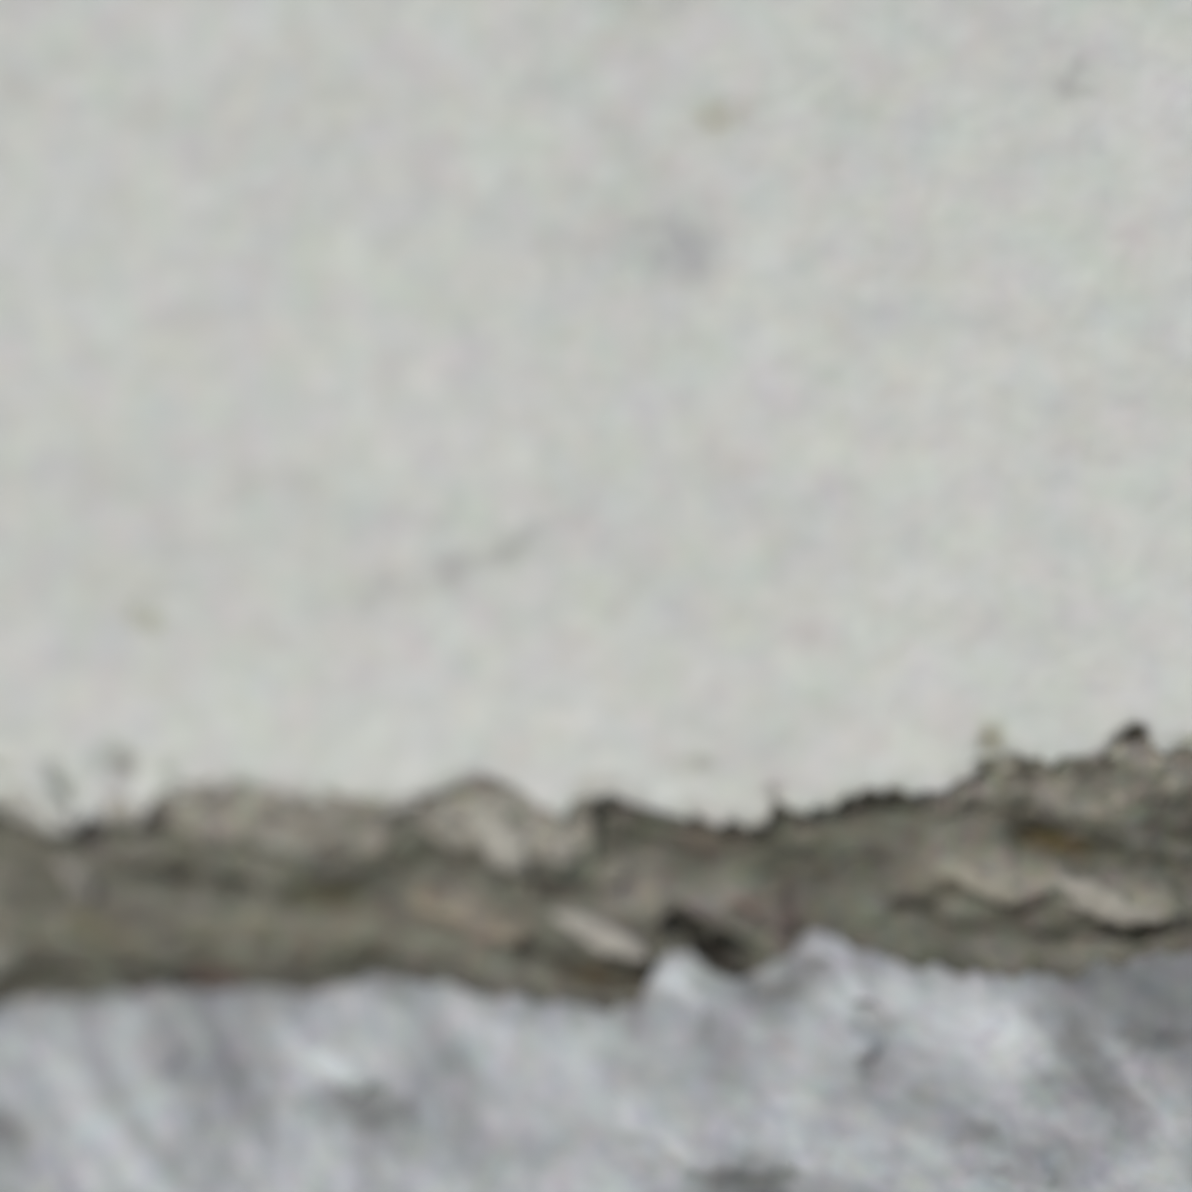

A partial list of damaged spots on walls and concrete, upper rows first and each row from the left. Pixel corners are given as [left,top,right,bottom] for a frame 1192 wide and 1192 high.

spalling [96,773,598,896]
spalling [892,736,1192,840]